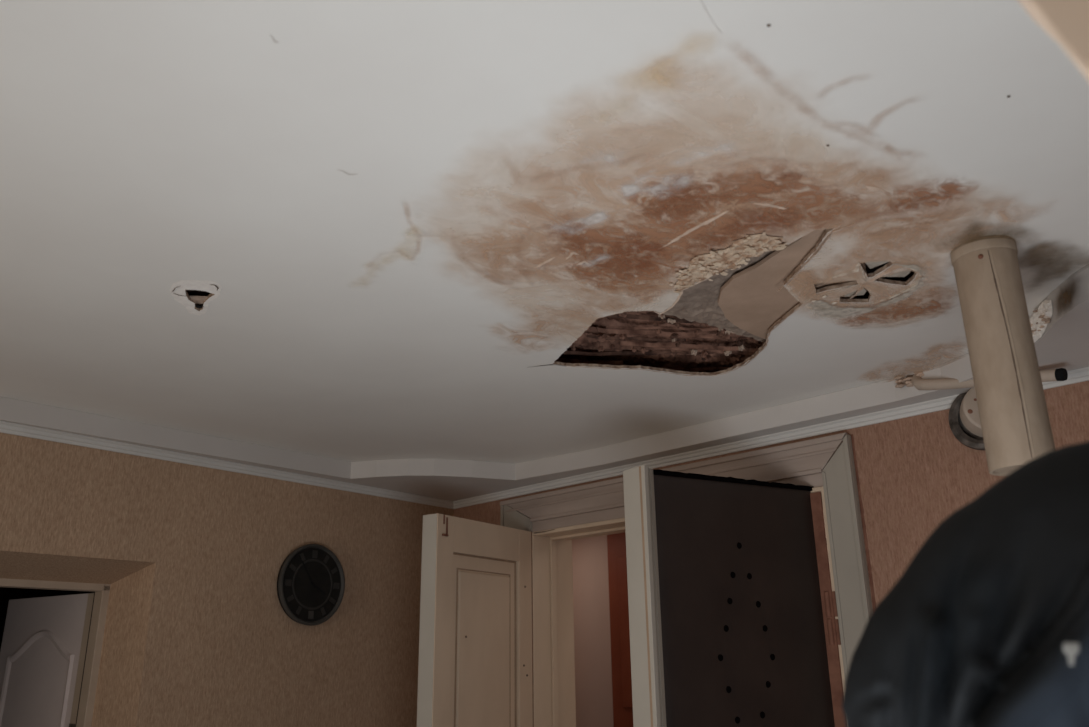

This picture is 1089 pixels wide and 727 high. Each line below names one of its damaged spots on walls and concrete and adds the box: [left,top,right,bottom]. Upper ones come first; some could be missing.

damp [470,146,962,324]
damp [954,212,1017,246]
flaking render [669,232,787,294]
damp [1026,245,1072,279]
spalling [169,280,222,316]
damp [1058,285,1074,310]